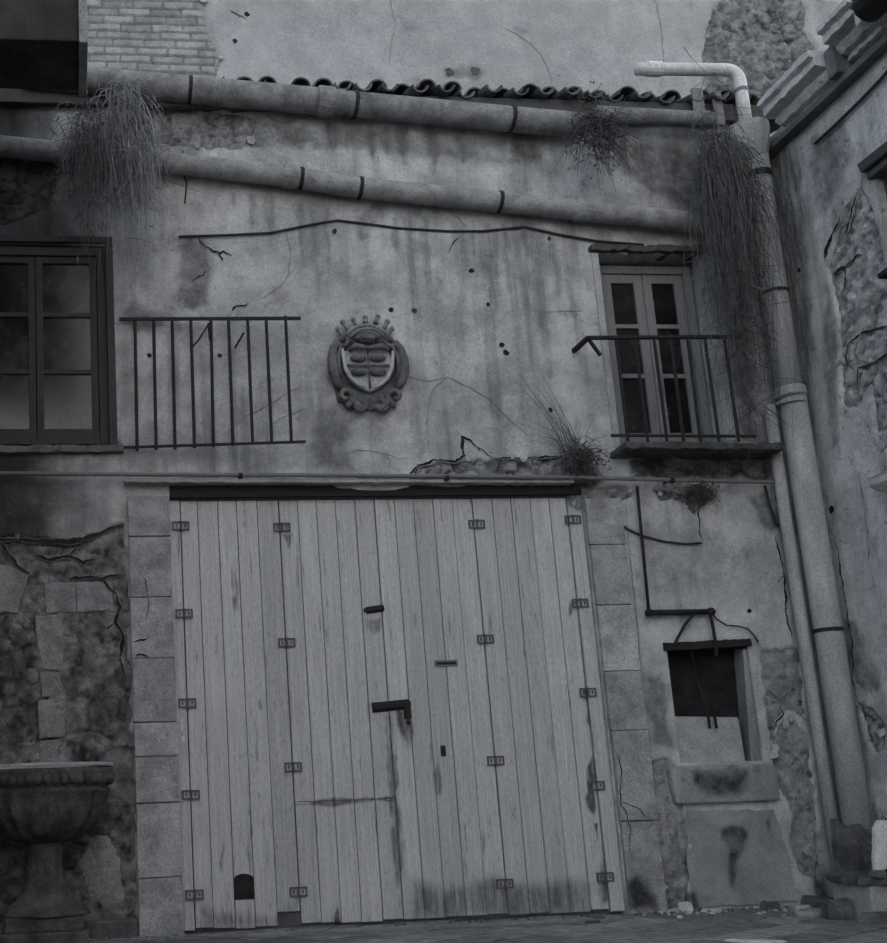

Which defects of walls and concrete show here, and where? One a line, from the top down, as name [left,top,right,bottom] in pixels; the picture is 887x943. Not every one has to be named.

spalling [702,0,815,98]
spalling [141,110,257,150]
spalling [0,157,60,226]
spalling [825,189,887,450]
crack [348,376,564,474]
spalling [0,524,139,936]
leakage [694,771,746,794]
spalling [760,648,818,879]
leakage [723,826,746,841]